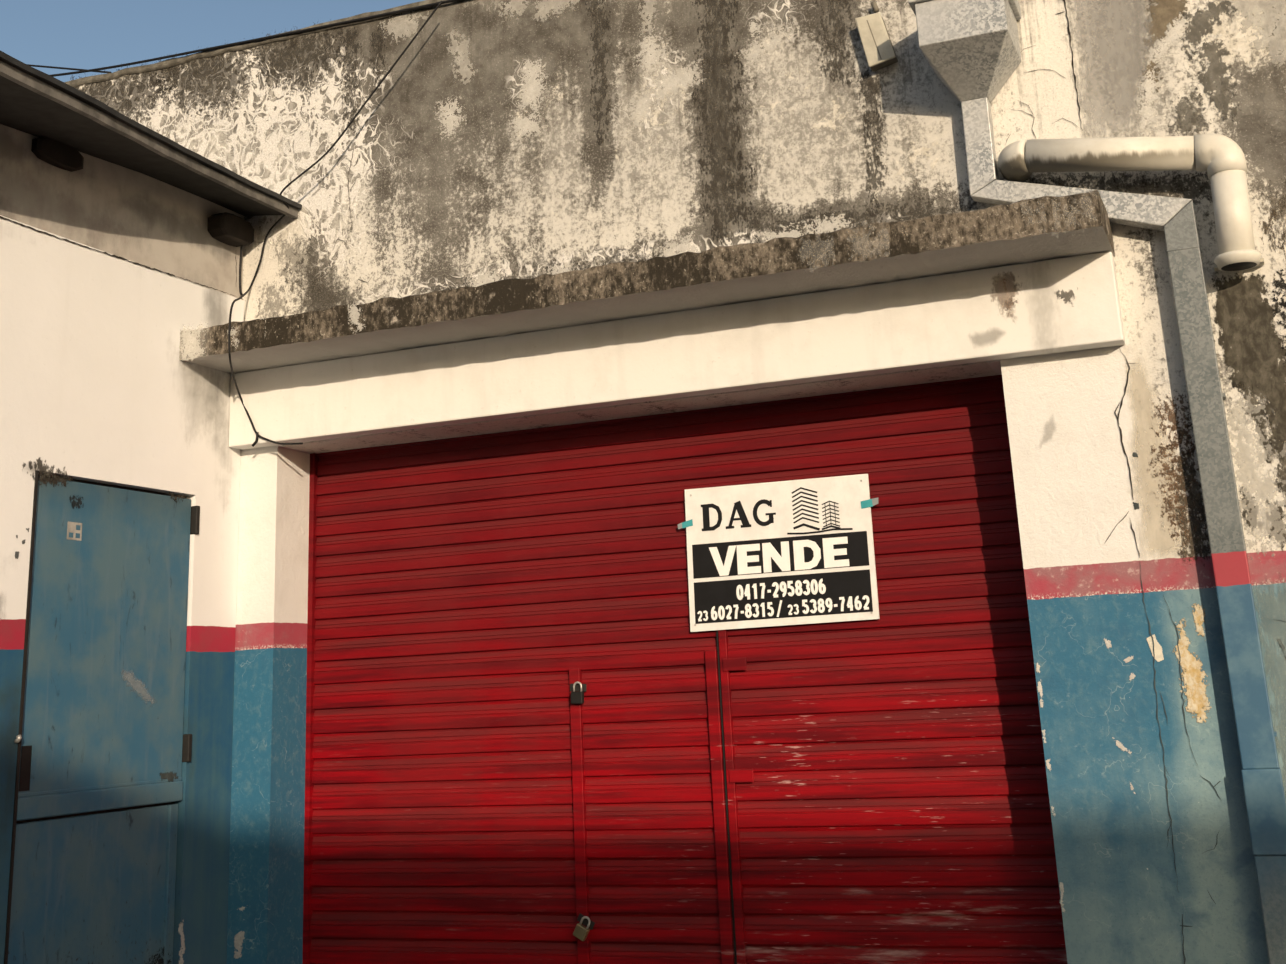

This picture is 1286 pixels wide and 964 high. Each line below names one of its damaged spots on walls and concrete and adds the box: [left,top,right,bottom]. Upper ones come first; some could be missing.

damp [70,24,388,132]
damp [585,0,611,145]
damp [690,0,978,248]
damp [421,245,664,293]
damp [1171,452,1210,560]
peeling [1036,663,1044,708]
crack [1104,350,1221,964]
spalling [1146,603,1212,724]